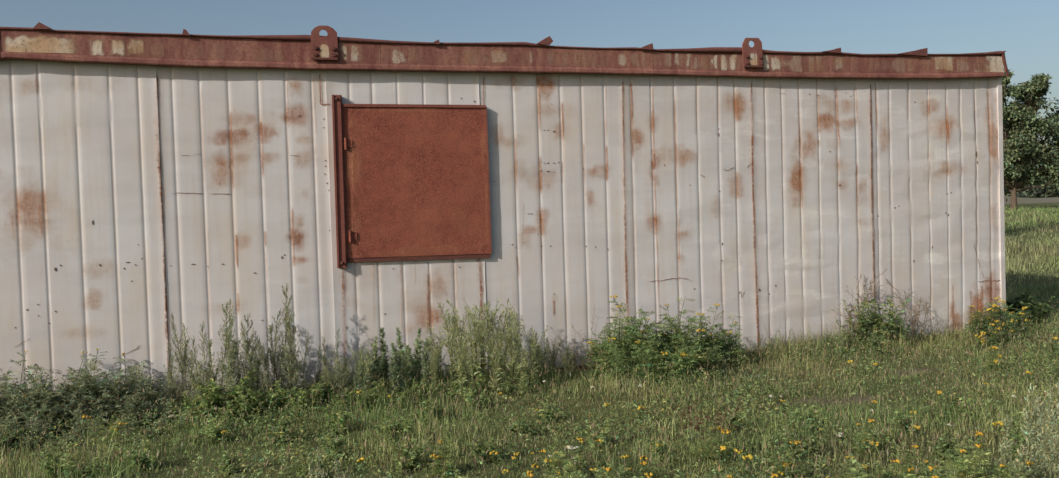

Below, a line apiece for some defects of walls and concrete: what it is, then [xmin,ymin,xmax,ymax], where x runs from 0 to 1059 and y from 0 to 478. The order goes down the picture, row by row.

rust [792,168,802,191]
rust [972,278,999,320]